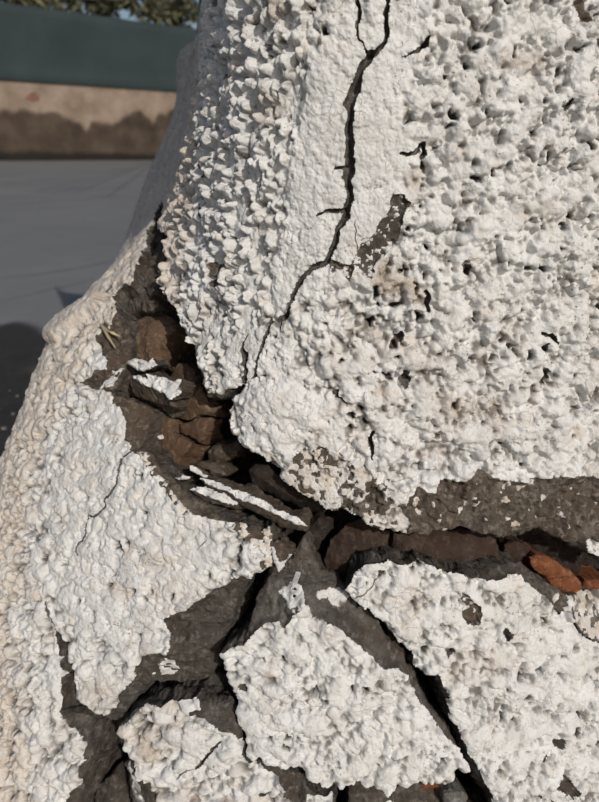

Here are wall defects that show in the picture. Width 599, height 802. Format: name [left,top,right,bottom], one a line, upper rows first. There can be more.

crack [402,35,432,58]
water stain [0,110,173,161]
crack [399,141,427,160]
crack [214,0,391,385]
crack [423,289,431,313]
crack [541,332,560,345]
crack [75,448,140,556]
spalling [54,193,599,802]